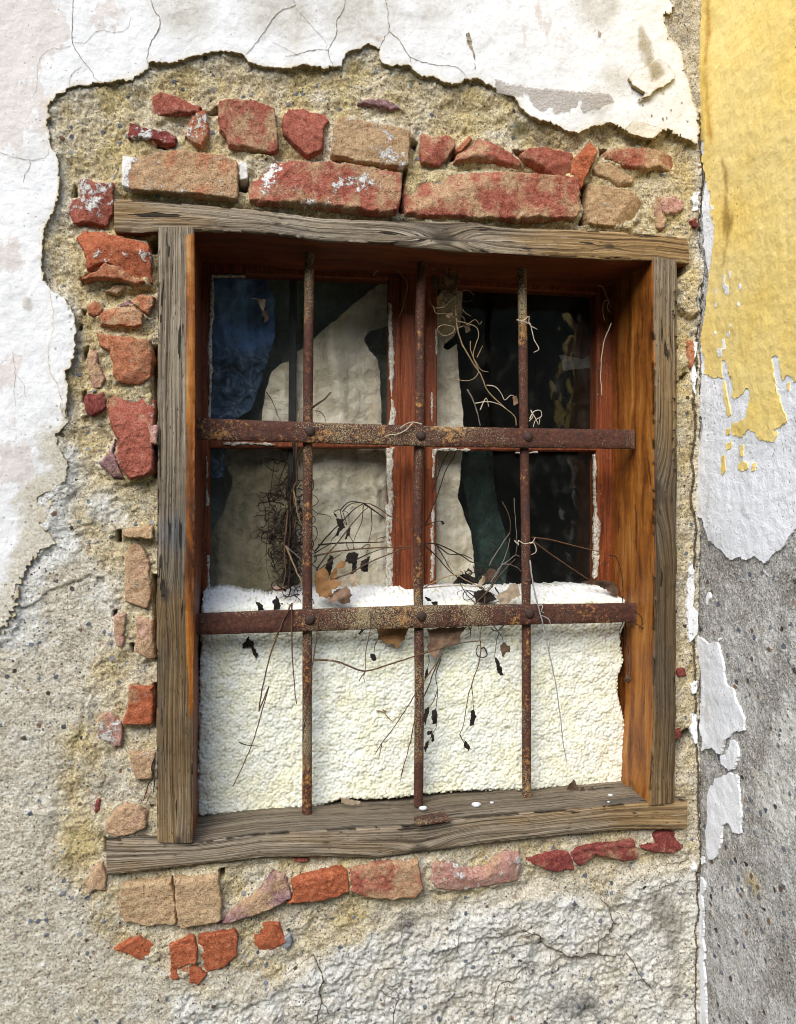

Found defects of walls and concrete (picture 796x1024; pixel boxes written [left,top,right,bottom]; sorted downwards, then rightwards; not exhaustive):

crack [32,0,161,97]
crack [247,0,346,64]
crack [379,0,465,75]
flaking render [627,0,701,109]
peeling [702,181,714,275]
peeling [714,271,731,308]
peeling [696,346,796,536]
flaking render [37,45,704,989]
flaking render [697,519,796,1024]
crack [484,900,656,1023]